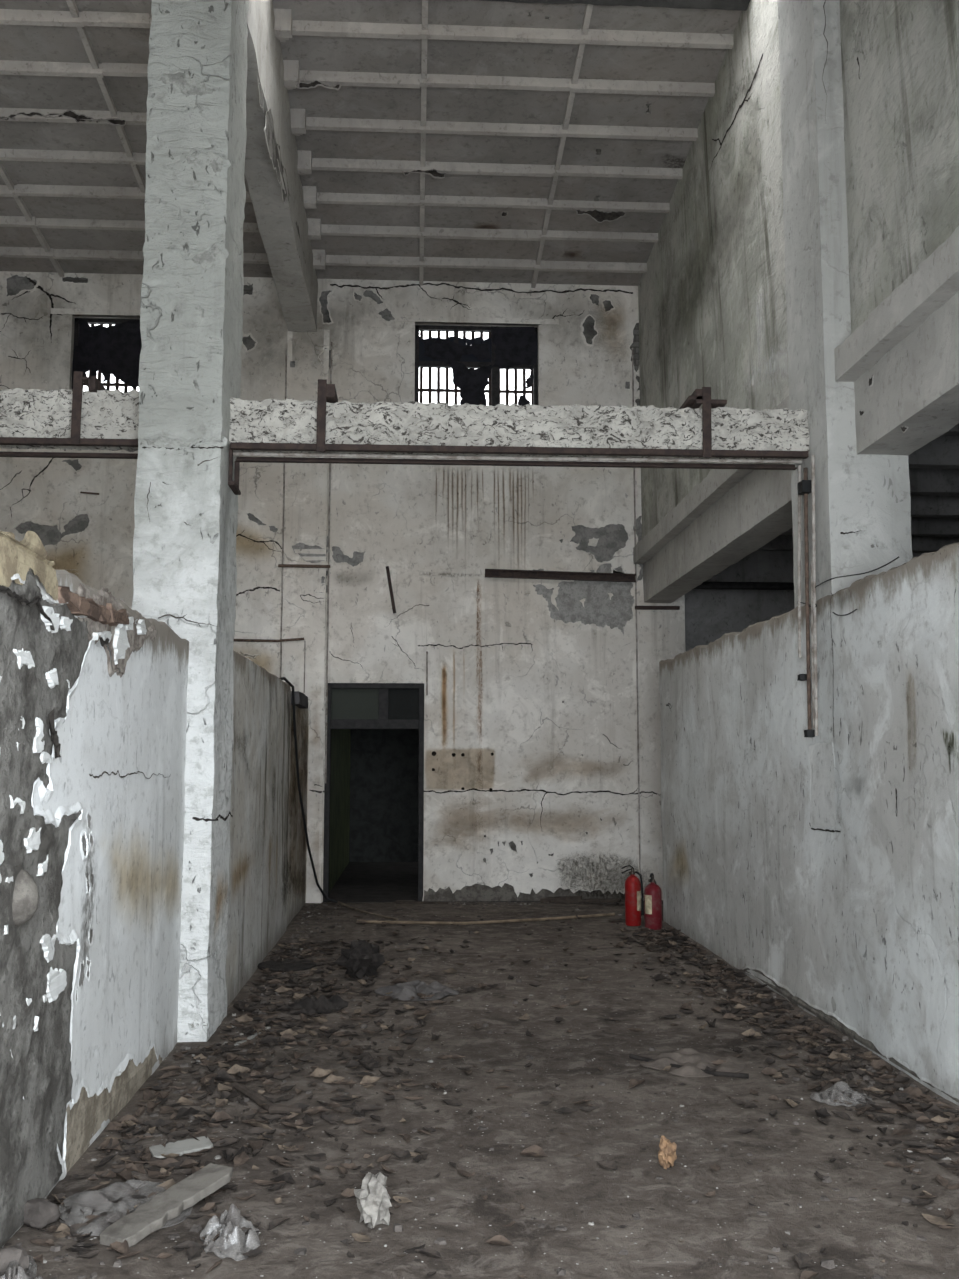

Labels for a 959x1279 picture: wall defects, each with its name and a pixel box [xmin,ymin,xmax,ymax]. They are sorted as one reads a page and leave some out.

spalling [0,110,127,126]
spalling [257,76,290,206]
peeling [59,458,85,474]
crack [236,531,282,552]
crack [236,587,322,603]
peeling [531,515,643,637]
crack [390,604,533,669]
crack [89,770,171,779]
crack [424,734,657,828]
peeling [482,834,523,865]
peeling [0,509,173,1247]
spalling [422,852,625,901]